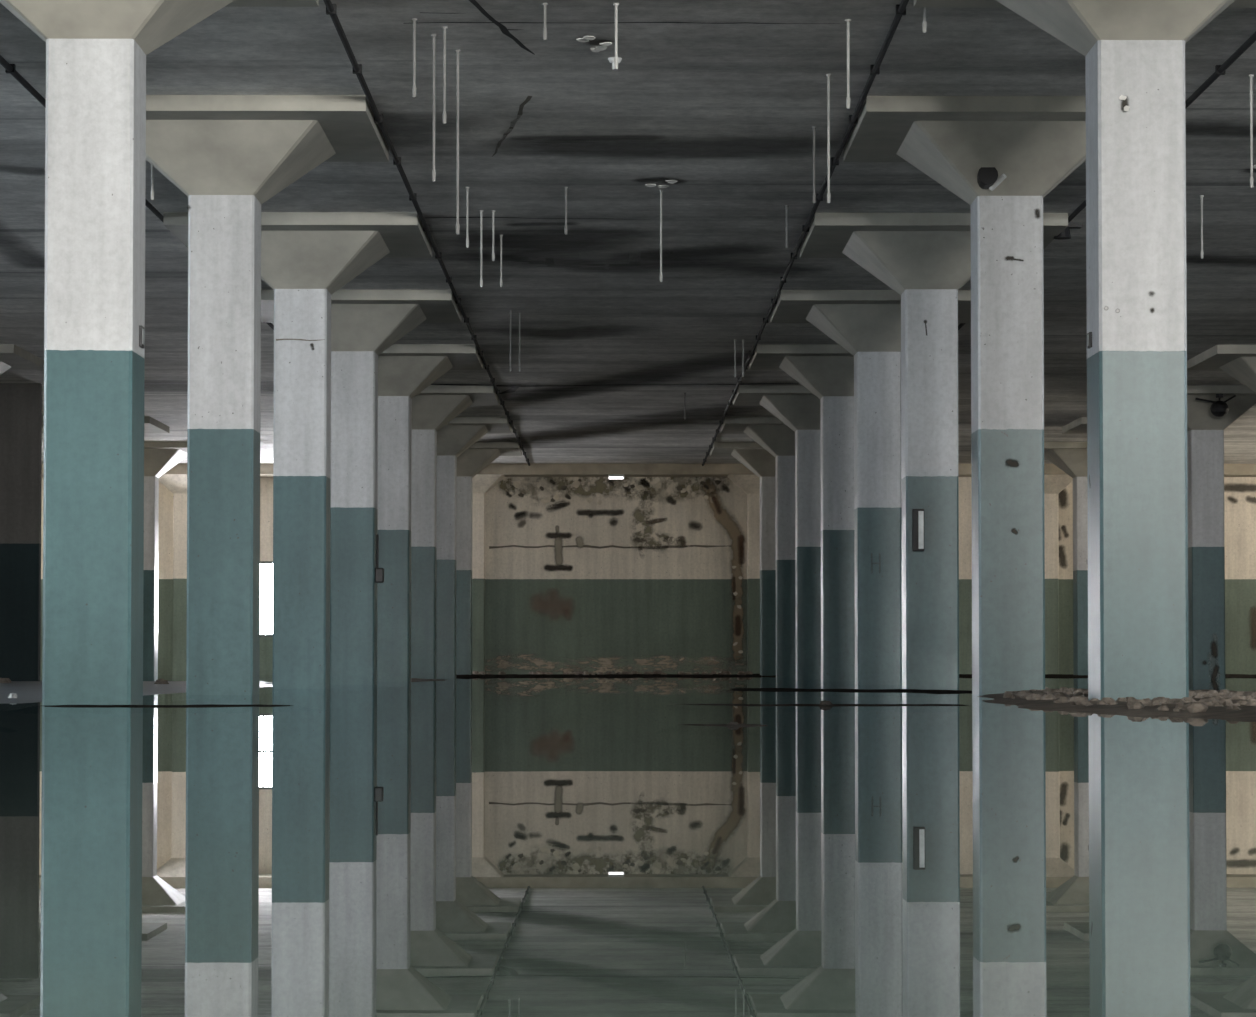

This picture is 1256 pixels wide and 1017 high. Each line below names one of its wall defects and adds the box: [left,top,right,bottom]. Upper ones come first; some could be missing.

damp [519,136,807,156]
damp [469,223,812,273]
peeling [500,477,729,509]